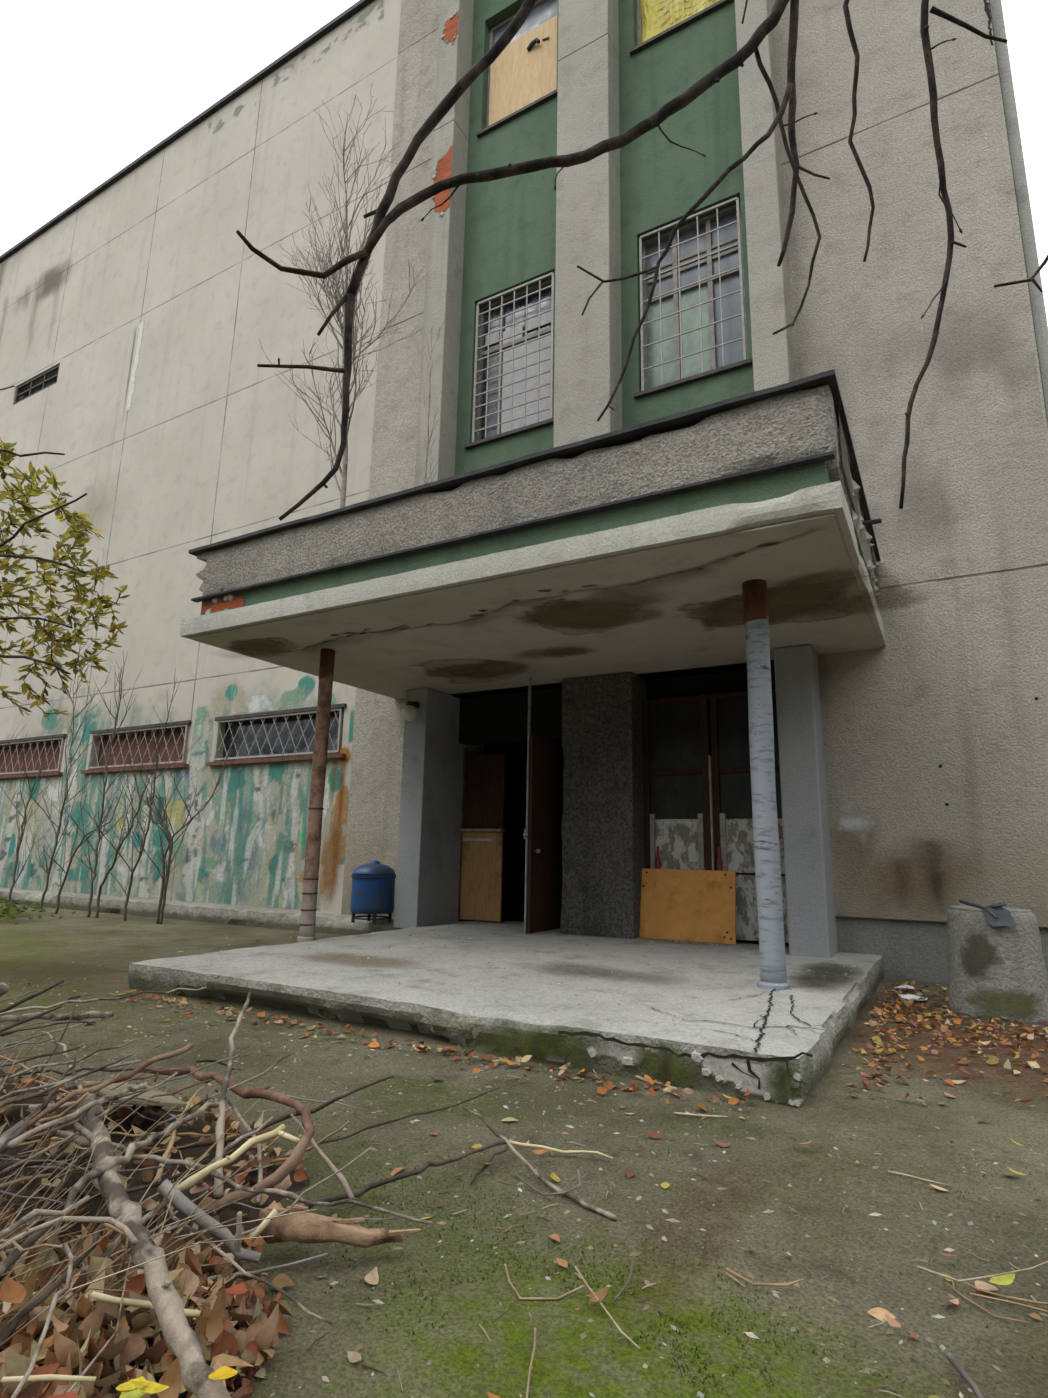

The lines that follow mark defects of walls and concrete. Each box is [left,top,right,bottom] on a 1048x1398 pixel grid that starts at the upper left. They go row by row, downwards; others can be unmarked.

spalling [441,10,459,45]
spalling [431,145,453,217]
damp [420,594,656,683]
damp [683,595,744,628]
damp [767,572,917,625]
damp [962,934,1039,1018]
crack [558,986,828,1089]